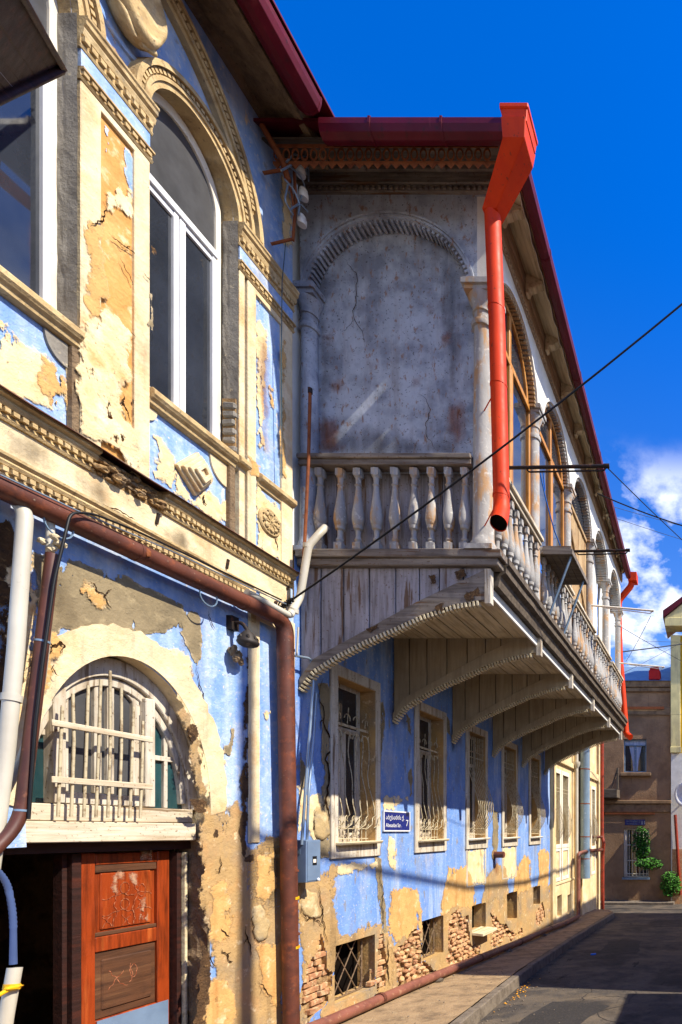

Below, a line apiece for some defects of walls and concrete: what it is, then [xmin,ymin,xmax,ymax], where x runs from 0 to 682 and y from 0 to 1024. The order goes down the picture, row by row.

peeling [0,147,226,522]
peeling [248,320,287,561]
peeling [44,559,203,692]
peeling [177,684,283,1024]
peeling [297,683,550,1024]